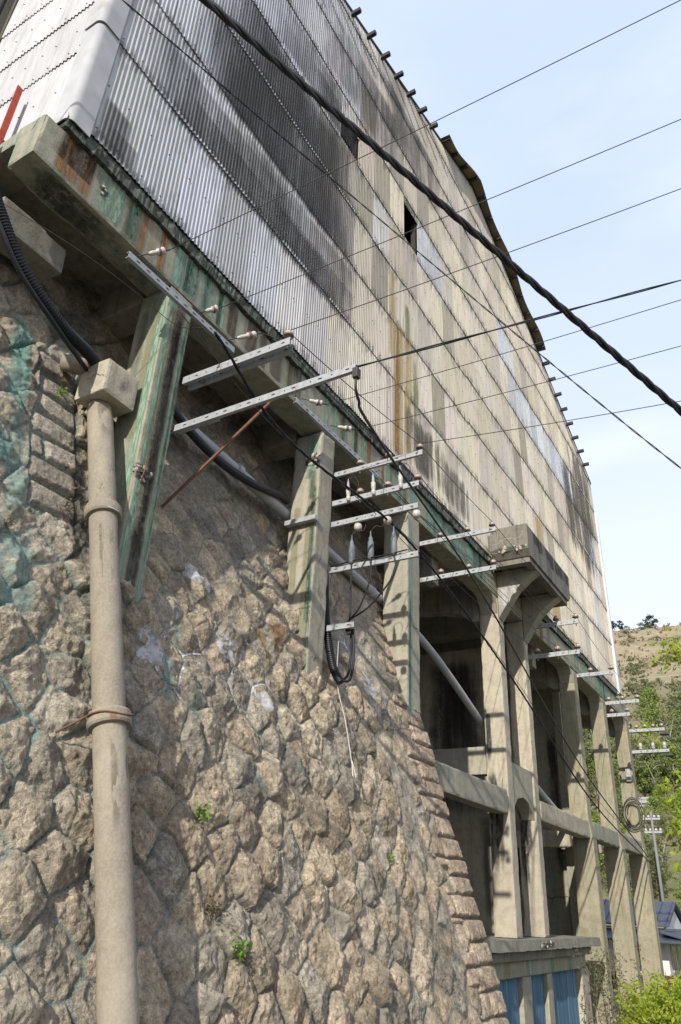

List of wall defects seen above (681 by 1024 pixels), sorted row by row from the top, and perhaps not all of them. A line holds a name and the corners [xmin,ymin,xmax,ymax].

rust [56,132,97,195]
water stain [180,2,421,275]
water stain [172,246,267,352]
water stain [261,358,302,399]
water stain [136,616,290,714]